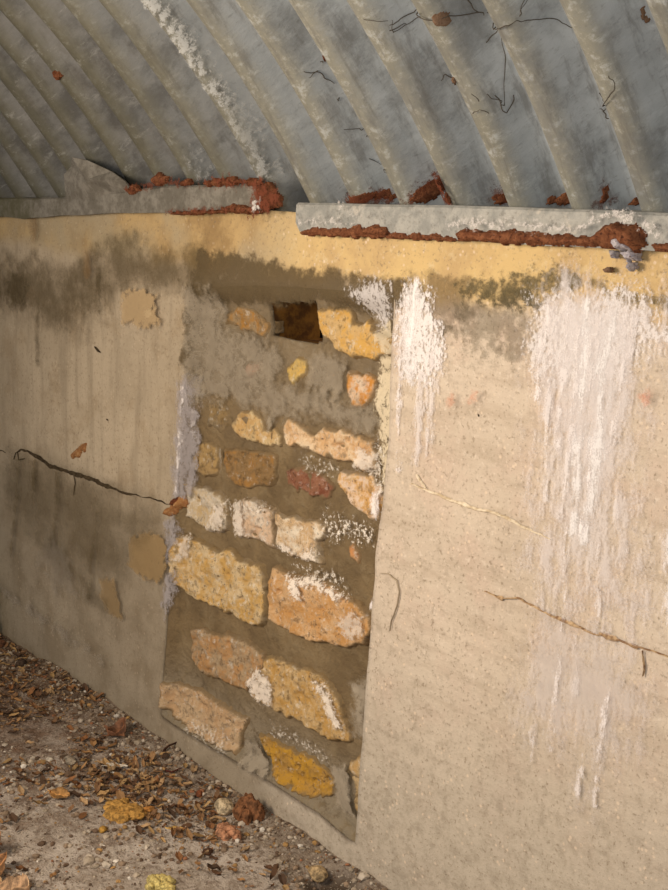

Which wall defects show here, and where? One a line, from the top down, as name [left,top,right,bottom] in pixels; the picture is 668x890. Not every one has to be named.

rust [124,172,284,220]
rust [345,171,452,205]
rust [546,192,570,206]
rust [300,224,598,248]
rust [651,243,668,252]
leakage [171,249,447,548]
leakage [454,264,668,616]
crack [0,449,167,505]
leakage [272,544,347,603]
crack [484,591,668,676]
leakage [246,667,272,706]
leakage [310,681,343,729]